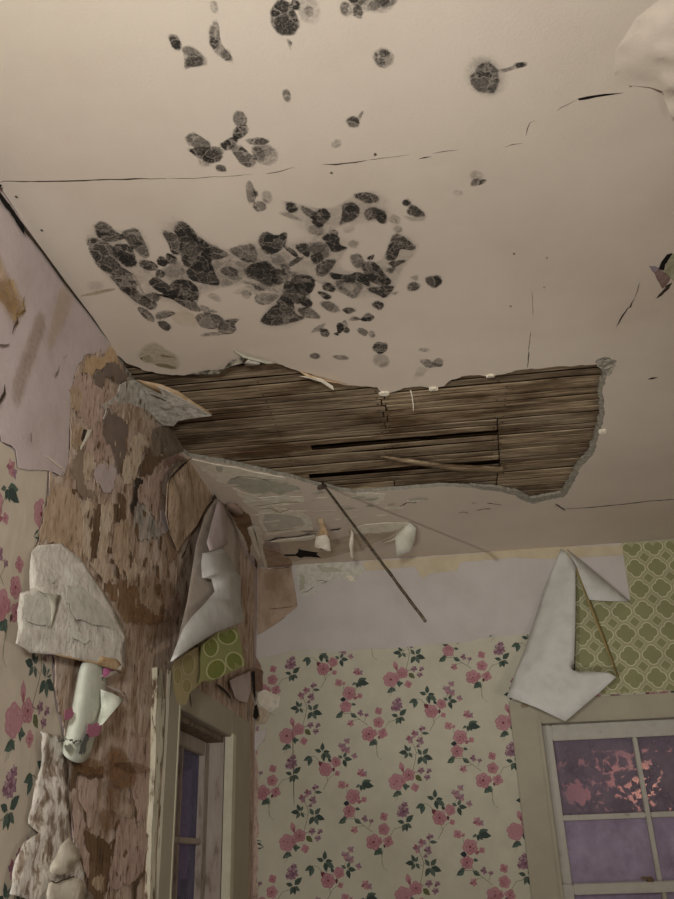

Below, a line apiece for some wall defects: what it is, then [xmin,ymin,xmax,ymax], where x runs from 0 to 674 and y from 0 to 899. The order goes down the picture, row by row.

damp [169,36,203,67]
damp [271,0,300,44]
crack [561,93,620,108]
crack [2,168,290,182]
damp [186,113,272,171]
crack [325,150,455,165]
damp [88,193,415,354]
crack [0,282,26,347]
peeling [0,202,118,477]
peeling [192,459,557,657]
peeling [114,666,165,899]
peeling [9,732,90,899]